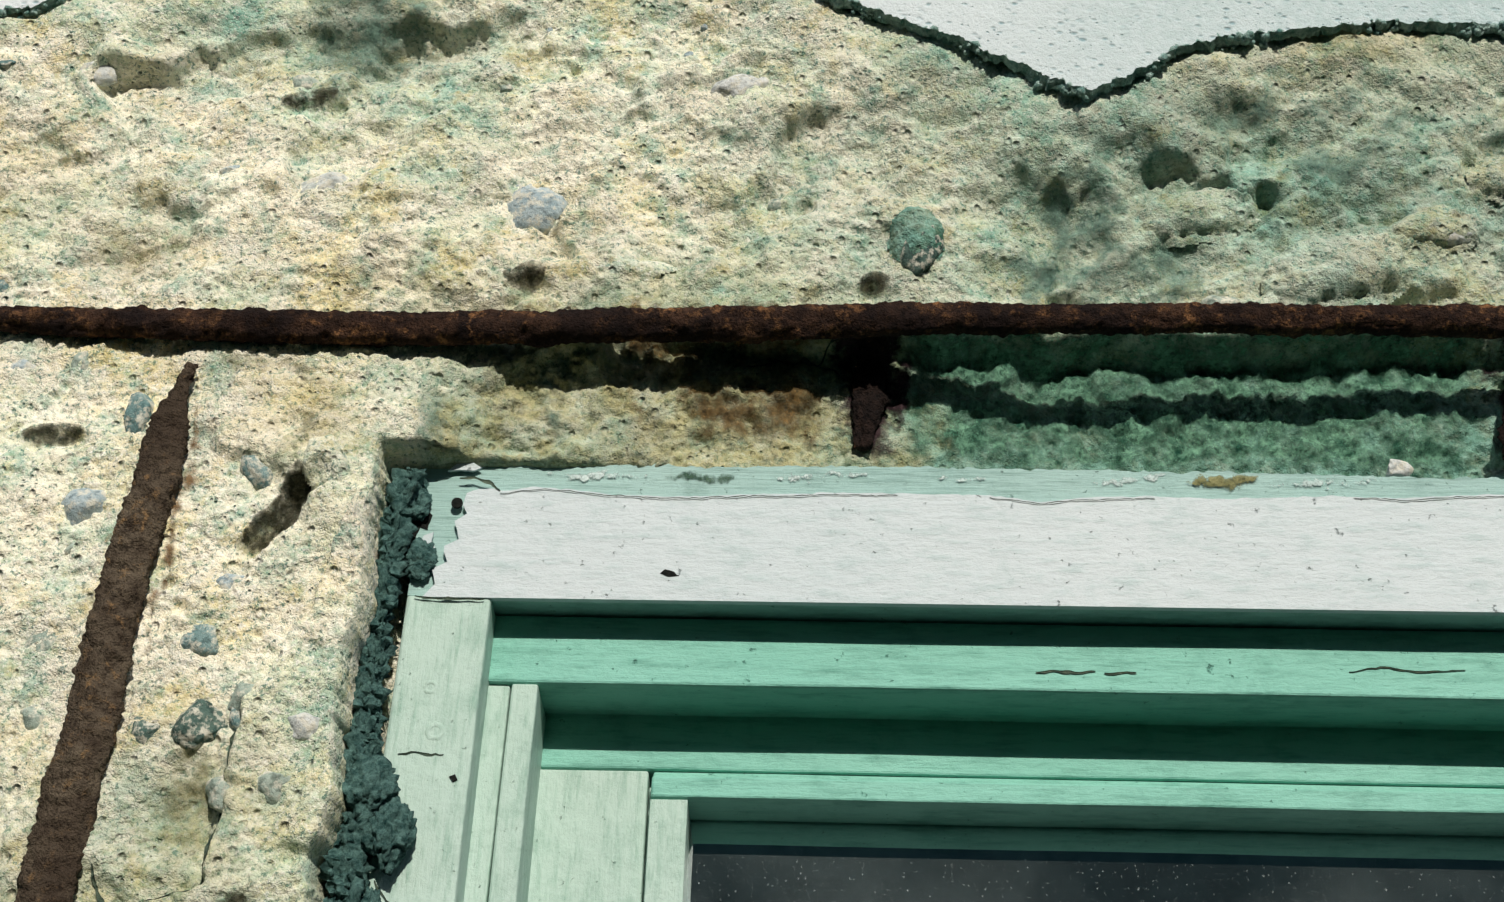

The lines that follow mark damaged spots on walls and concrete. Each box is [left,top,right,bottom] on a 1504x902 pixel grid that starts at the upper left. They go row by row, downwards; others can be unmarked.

spalling [0,0,1504,313]
corrosion [147,422,200,602]
spalling [0,331,1504,902]